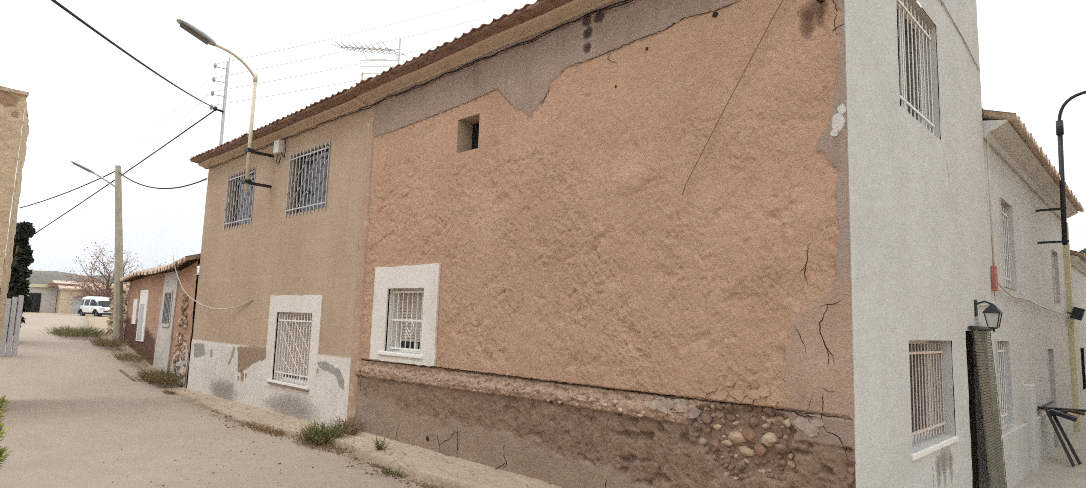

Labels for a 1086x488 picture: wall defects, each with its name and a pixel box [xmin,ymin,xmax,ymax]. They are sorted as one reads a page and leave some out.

peeling [228,346,266,382]
spalling [366,368,824,481]
crack [360,300,853,466]